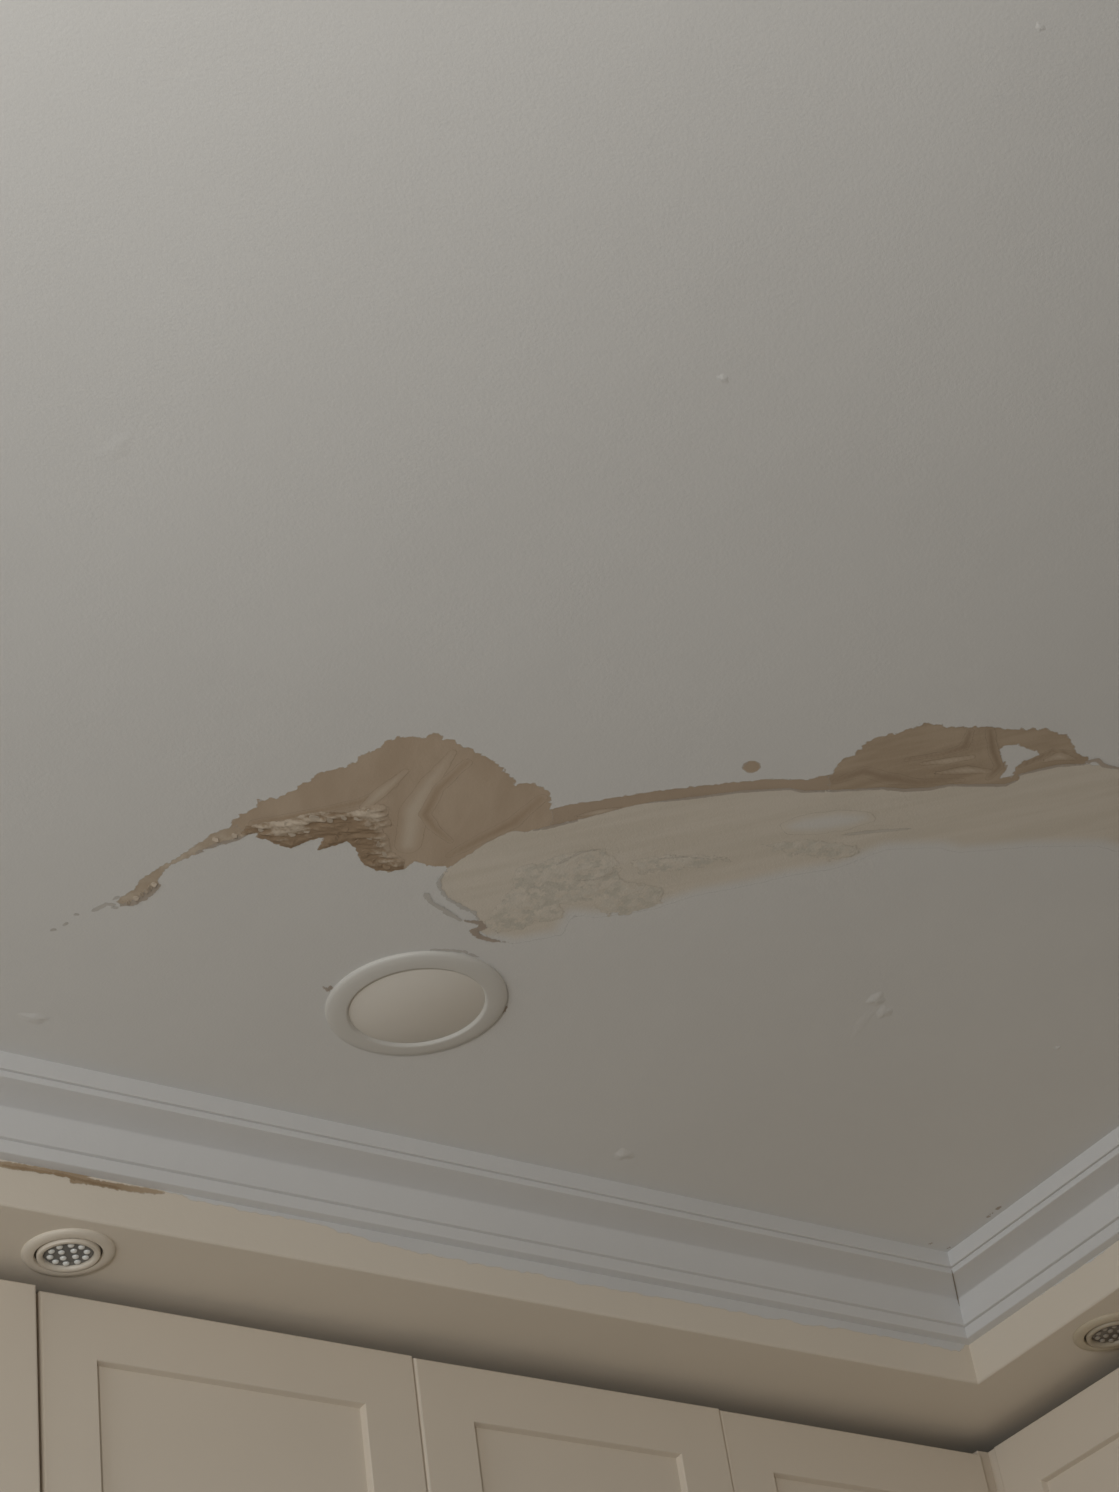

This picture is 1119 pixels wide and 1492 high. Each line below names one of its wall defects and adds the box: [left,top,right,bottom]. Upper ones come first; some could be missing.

flaking render [116,804,405,907]